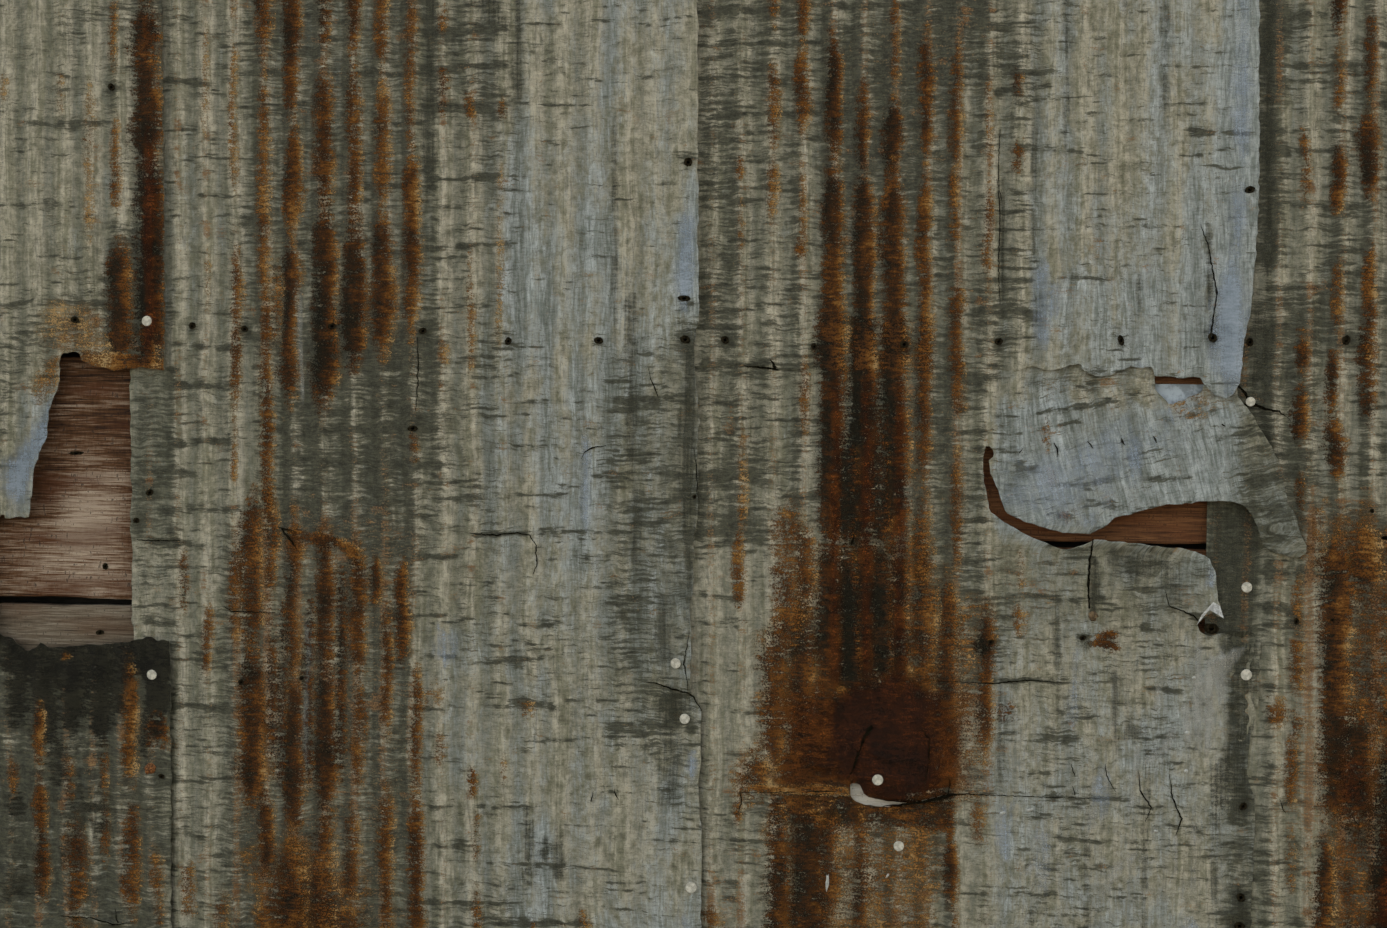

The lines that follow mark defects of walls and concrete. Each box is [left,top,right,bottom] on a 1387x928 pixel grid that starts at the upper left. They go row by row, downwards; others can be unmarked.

rust [32,0,166,405]
rust [1299,0,1384,215]
rust [7,653,231,928]
rust [178,551,191,613]
rust [200,0,447,928]
rust [466,769,481,862]
rust [471,884,484,928]
rust [728,0,1030,928]
rust [1262,471,1387,928]
rust [1288,241,1380,482]